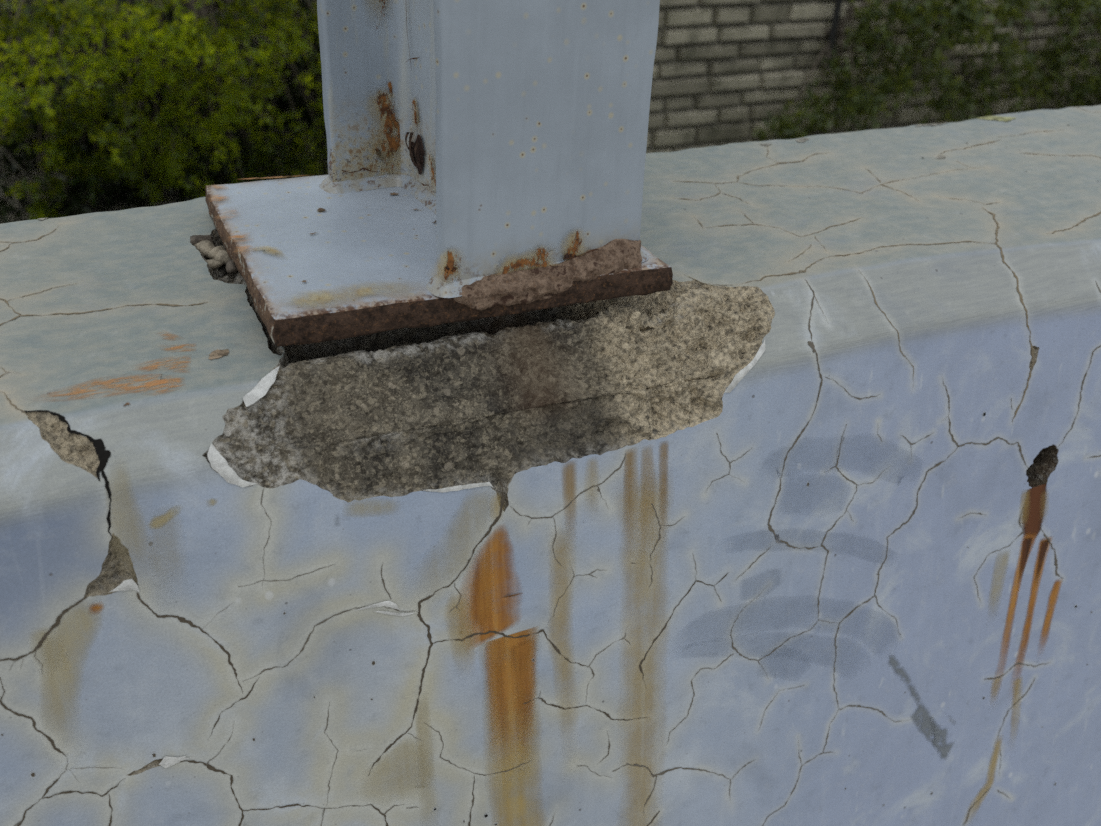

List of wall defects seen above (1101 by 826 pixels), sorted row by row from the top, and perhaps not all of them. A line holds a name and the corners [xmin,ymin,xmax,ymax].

rust [374,82,419,173]
crack [0,282,205,325]
rust [437,251,461,281]
rust [500,245,552,274]
spalling [202,239,775,512]
spalling [21,410,111,481]
crack [100,469,112,539]
crack [136,129,1101,826]
spalling [84,533,139,597]
rust [993,484,1061,661]
crack [0,597,124,826]
rust [471,531,537,826]